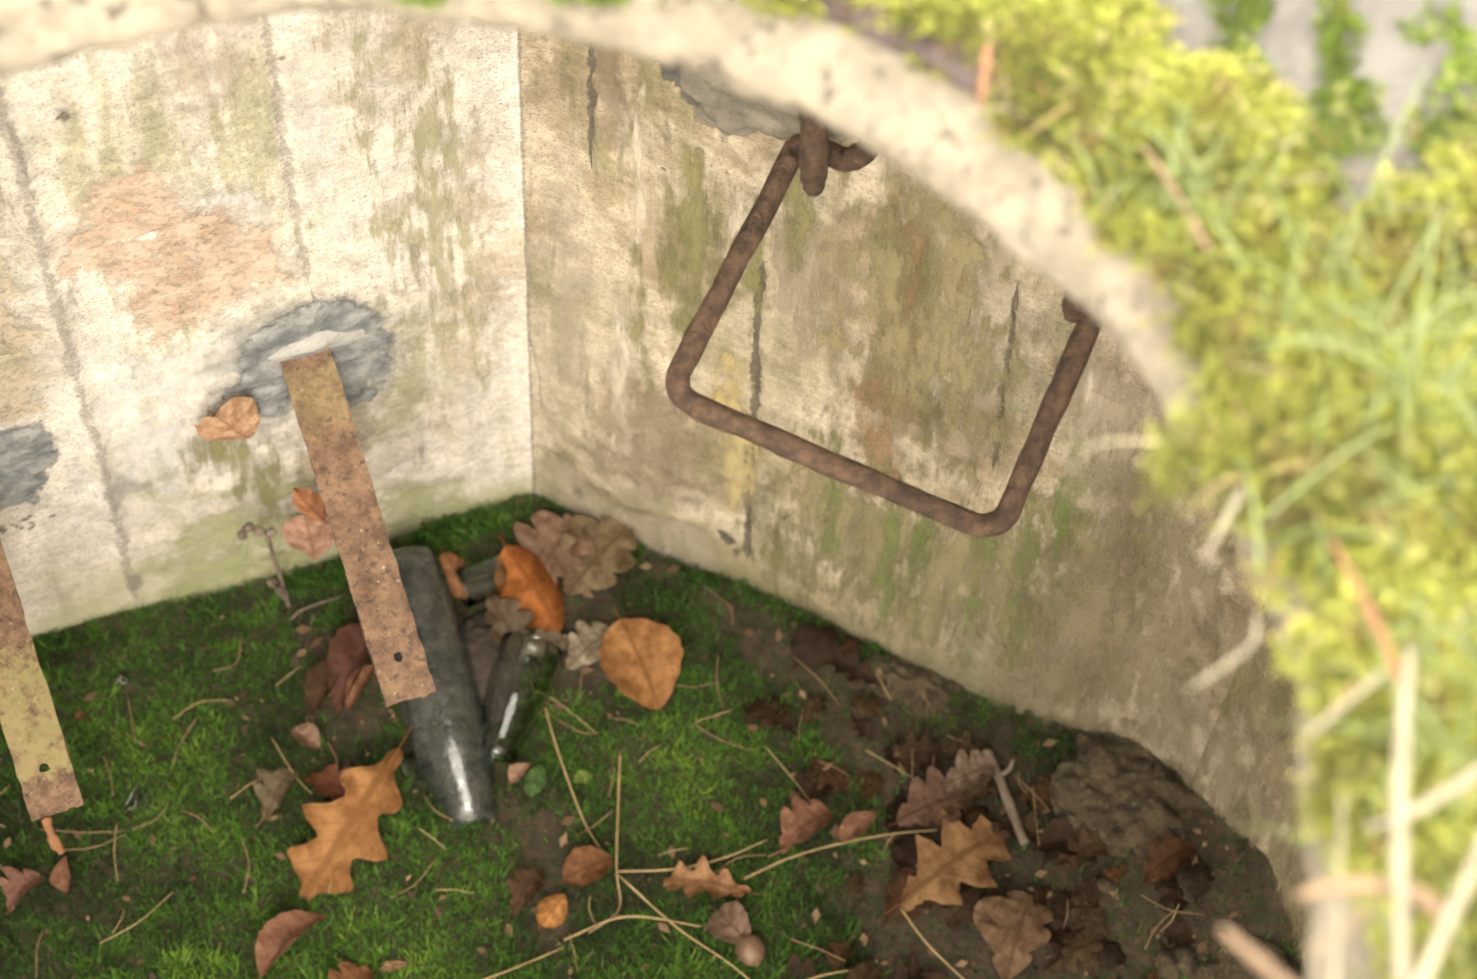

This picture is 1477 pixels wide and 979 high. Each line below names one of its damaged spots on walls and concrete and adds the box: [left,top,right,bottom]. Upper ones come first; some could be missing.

spalling [660,64,682,87]
spalling [681,90,699,107]
damp [716,198,757,237]
damp [610,118,689,415]
damp [738,173,859,380]
corrosion [714,352,747,414]
damp [1084,373,1102,420]
corrosion [723,435,759,513]
damp [873,504,933,639]
damp [957,439,1311,977]